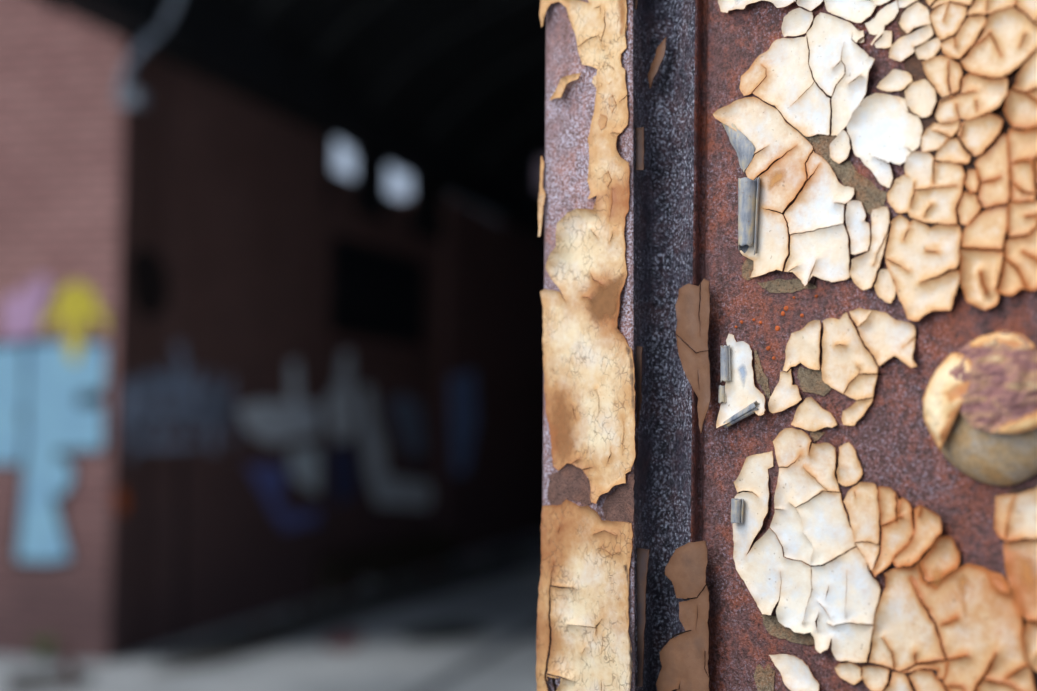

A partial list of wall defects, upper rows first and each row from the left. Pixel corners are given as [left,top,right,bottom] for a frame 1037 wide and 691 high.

peeling [648,37,667,89]
crack [766,201,847,235]
peeling [536,0,650,691]
corrosion [949,332,1037,433]
crack [789,496,901,567]
peeling [656,541,710,691]